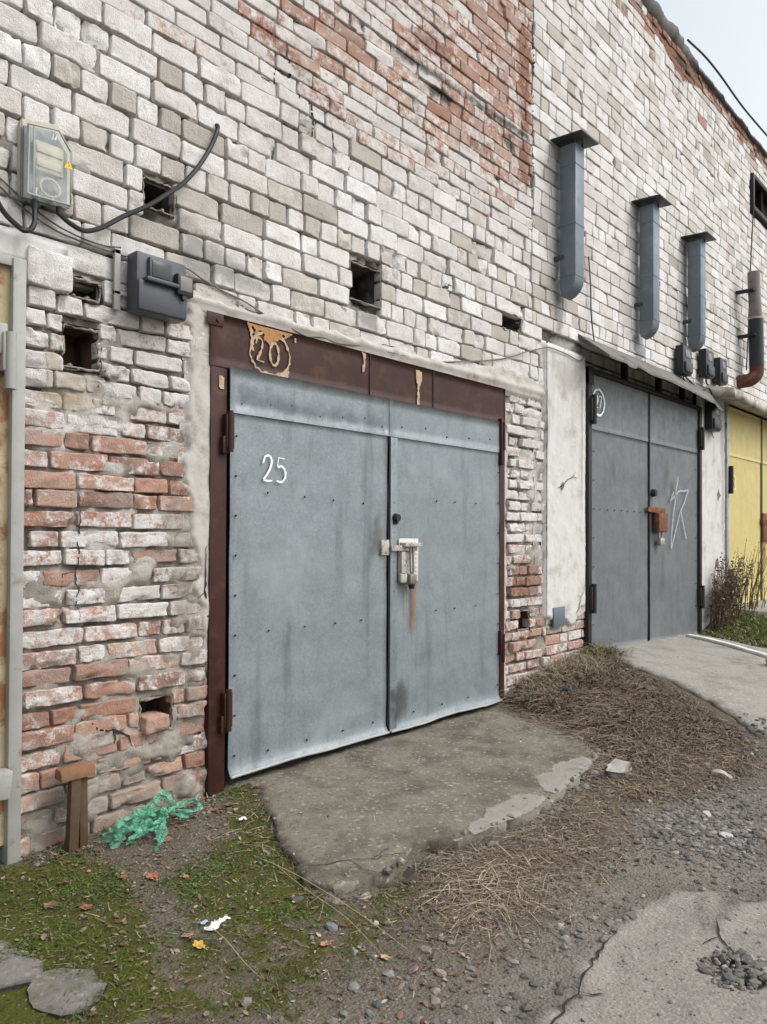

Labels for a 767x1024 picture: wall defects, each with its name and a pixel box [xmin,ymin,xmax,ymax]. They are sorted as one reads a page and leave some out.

peeling [247,322,296,378]
crack [61,498,88,612]
peeling [509,558,541,631]